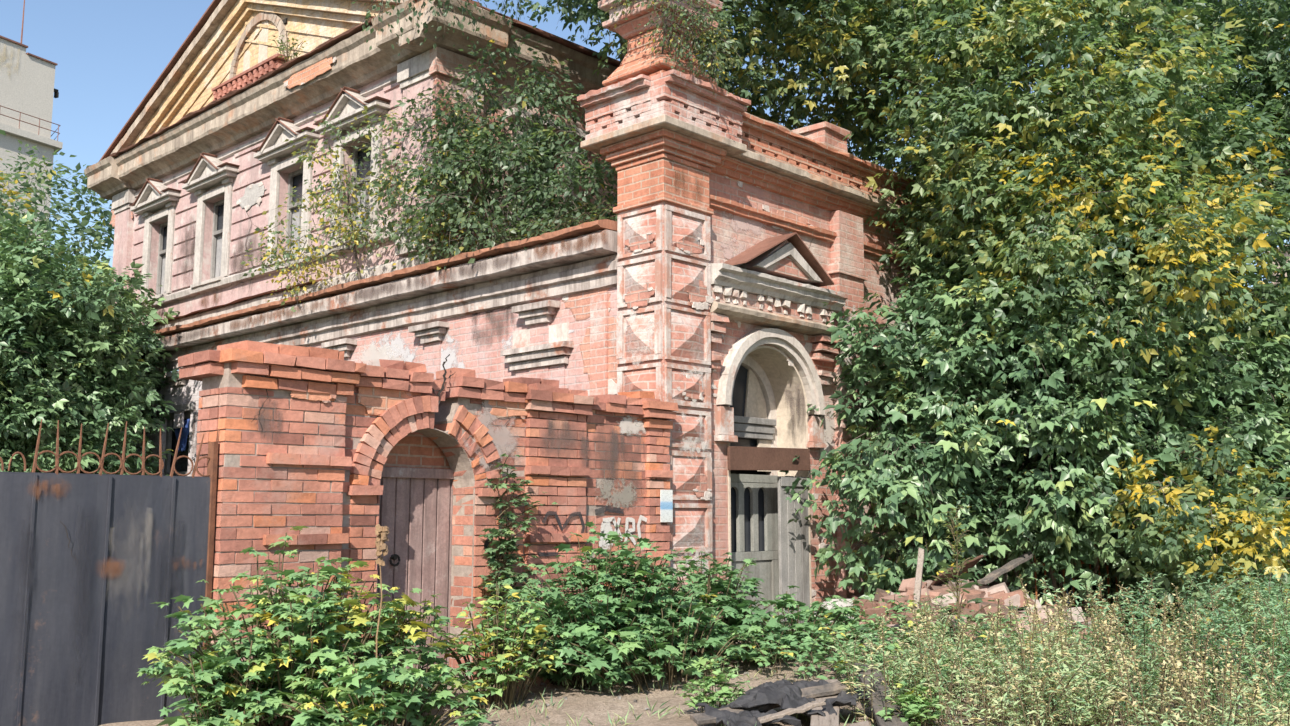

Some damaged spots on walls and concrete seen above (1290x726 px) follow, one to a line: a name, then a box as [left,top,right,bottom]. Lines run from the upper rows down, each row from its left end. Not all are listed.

peeling [384,342,414,362]
crack [432,354,456,403]
spalling [357,379,413,416]